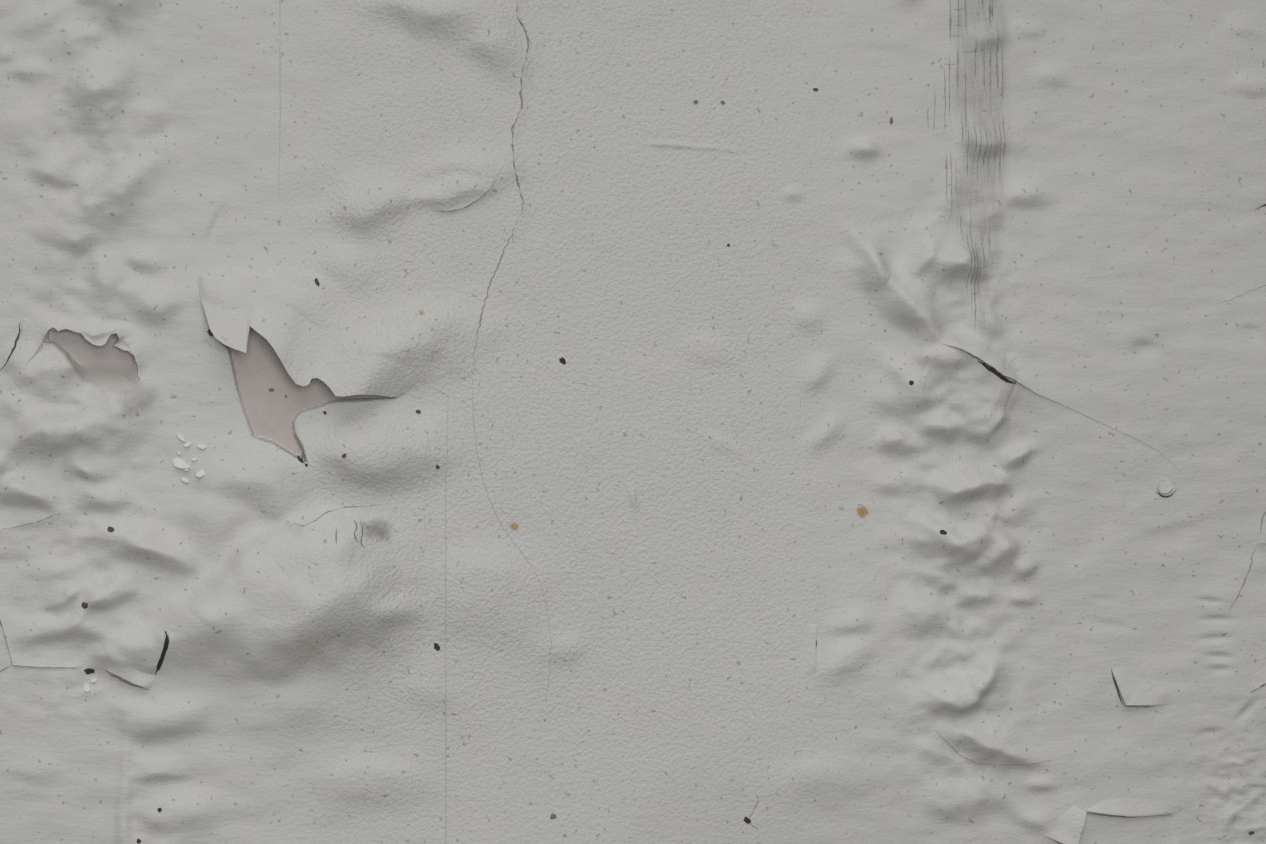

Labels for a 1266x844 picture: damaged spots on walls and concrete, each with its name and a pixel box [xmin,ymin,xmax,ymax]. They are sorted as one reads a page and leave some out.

peeling [0,311,157,383]
peeling [199,273,428,483]
crack [943,330,1189,471]
crack [0,514,188,690]
peeling [1111,664,1175,708]
peeling [1037,797,1184,844]